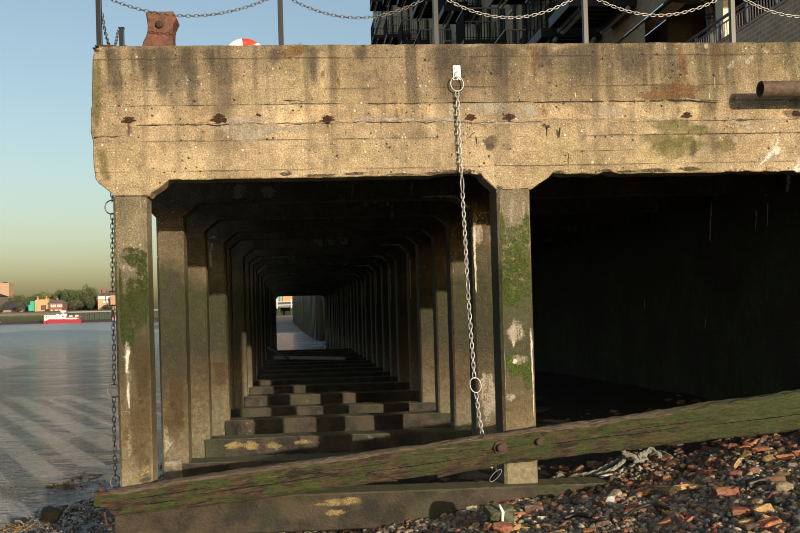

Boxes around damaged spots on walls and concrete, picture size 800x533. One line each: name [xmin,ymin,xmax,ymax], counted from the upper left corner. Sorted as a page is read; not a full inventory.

damp [758,134,781,167]
damp [786,158,800,192]
damp [504,321,534,422]